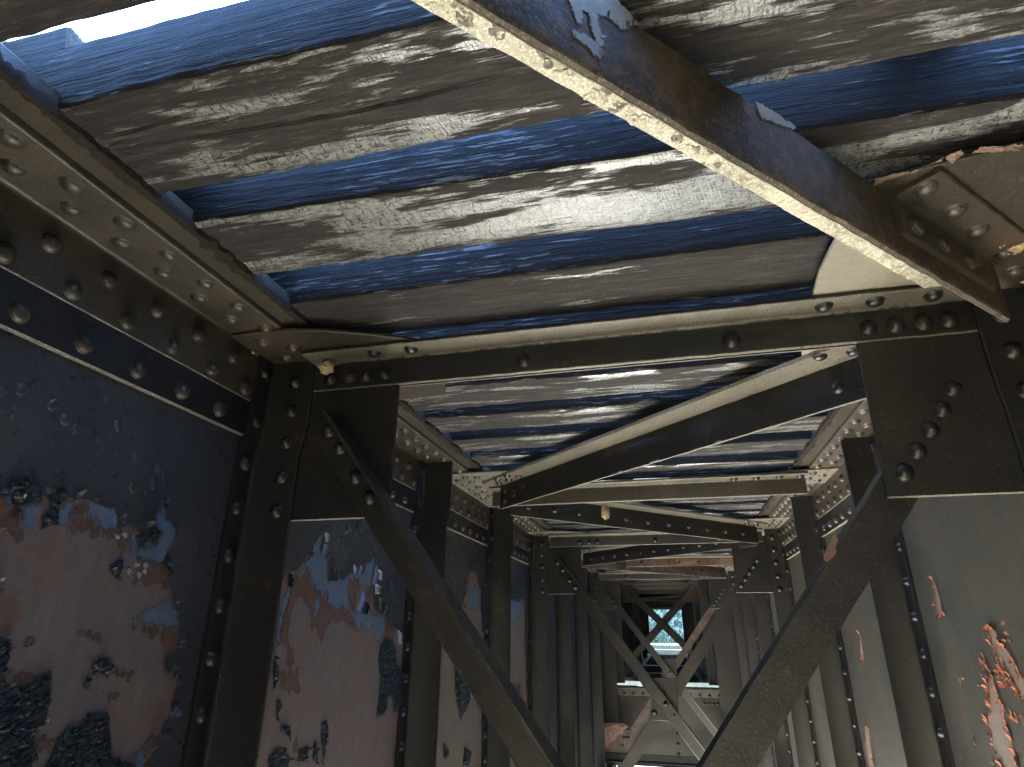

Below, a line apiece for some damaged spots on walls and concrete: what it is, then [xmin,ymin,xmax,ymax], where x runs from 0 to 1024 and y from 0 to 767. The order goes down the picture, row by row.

peeling [569,0,640,59]
peeling [0,474,187,767]
peeling [257,532,403,767]
peeling [927,576,945,619]
peeling [978,624,1024,767]